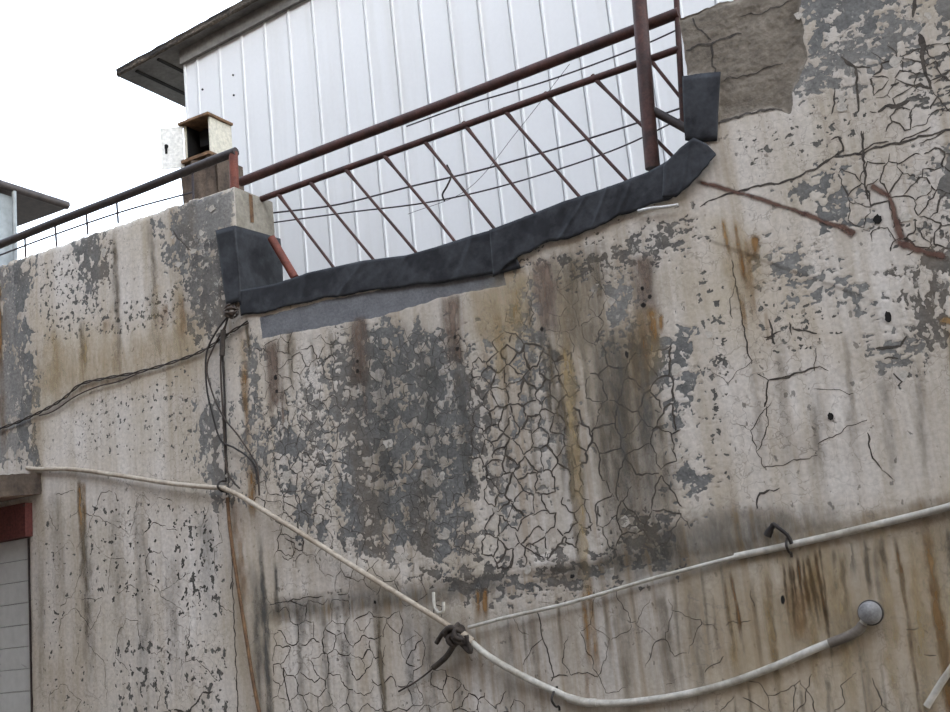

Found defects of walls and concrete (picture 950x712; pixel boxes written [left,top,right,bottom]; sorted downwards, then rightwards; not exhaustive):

peeling [0,188,242,472]
crack [49,458,238,712]
peeling [75,201,731,620]
crack [252,259,690,712]
crack [513,591,755,693]
corrosion [722,221,758,278]
corrosion [699,181,856,237]
crack [710,260,893,509]
corrosion [784,551,828,628]
spalling [679,0,950,390]
crack [700,0,950,255]
corrosion [870,184,945,259]